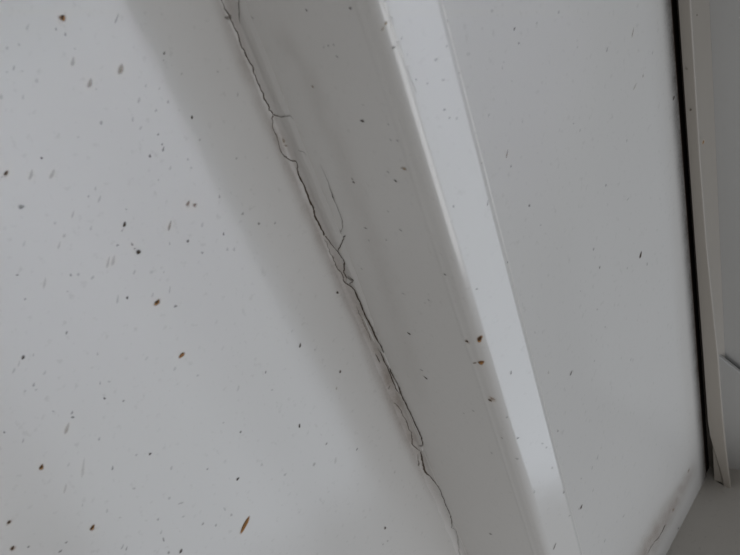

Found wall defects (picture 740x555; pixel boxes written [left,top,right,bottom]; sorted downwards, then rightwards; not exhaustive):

crack [225,2,285,120]
crack [284,156,452,528]